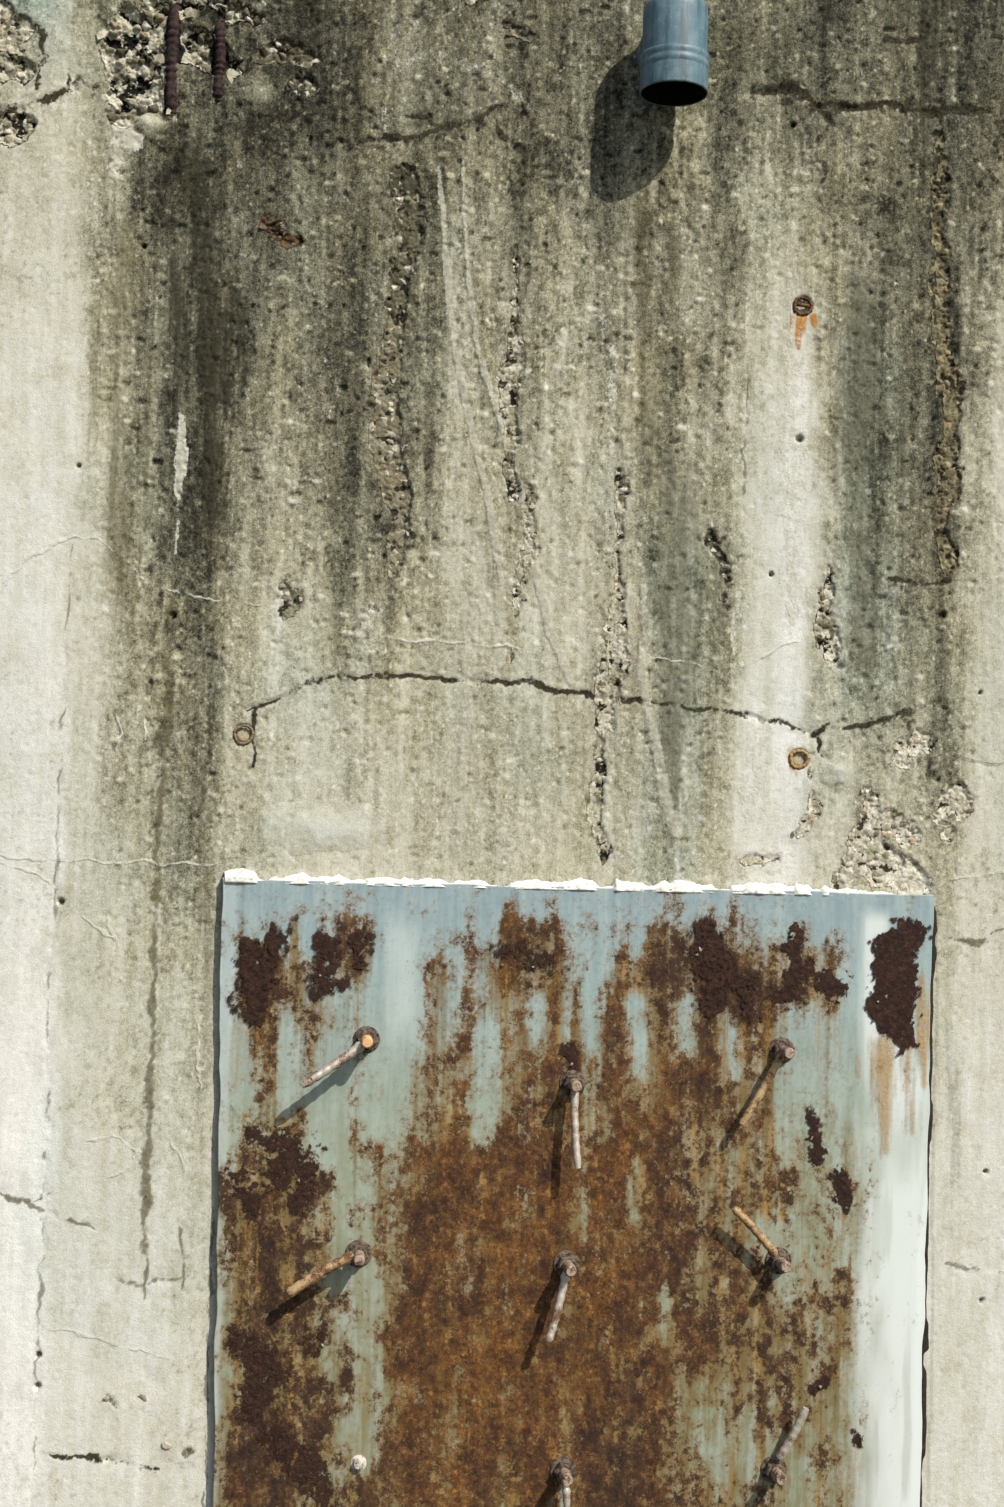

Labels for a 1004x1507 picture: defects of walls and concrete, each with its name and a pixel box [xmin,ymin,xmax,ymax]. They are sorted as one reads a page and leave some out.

spalling [96,0,323,129]
water stain [109,110,144,183]
water stain [169,137,246,532]
spalling [925,125,967,579]
water stain [435,160,574,685]
crack [247,671,942,768]
spalling [832,780,974,895]
rust [225,921,376,1028]
rust [682,908,933,1134]
crack [0,1192,95,1229]
rust [805,1105,853,1215]
crack [49,1452,160,1470]